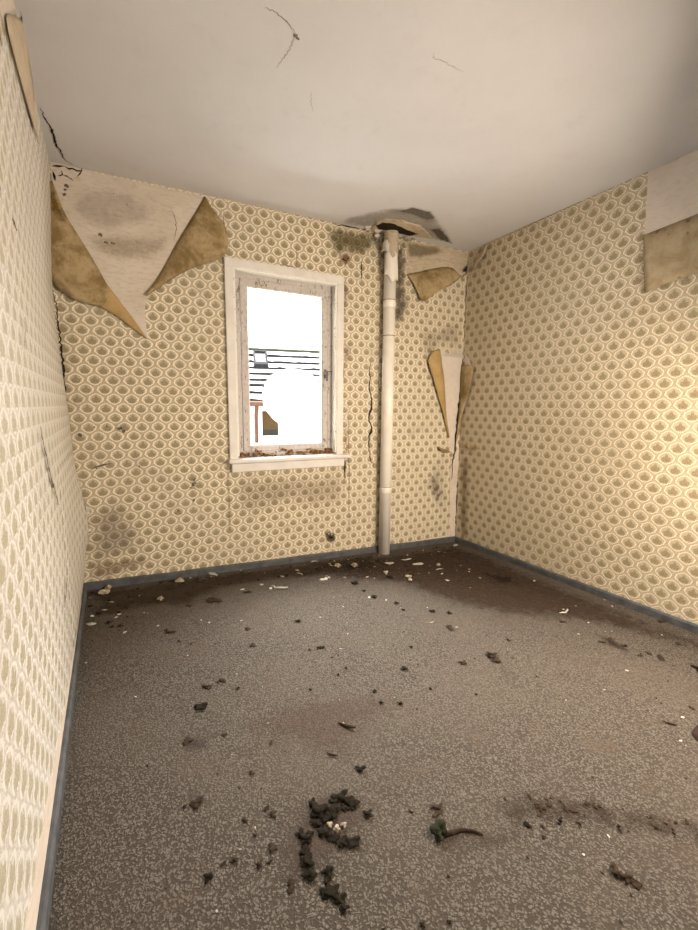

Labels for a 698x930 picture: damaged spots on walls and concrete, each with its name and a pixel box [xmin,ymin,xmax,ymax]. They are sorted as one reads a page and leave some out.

water stain [332,232,379,252]
flaking render [364,208,449,250]
crack [367,363,375,466]